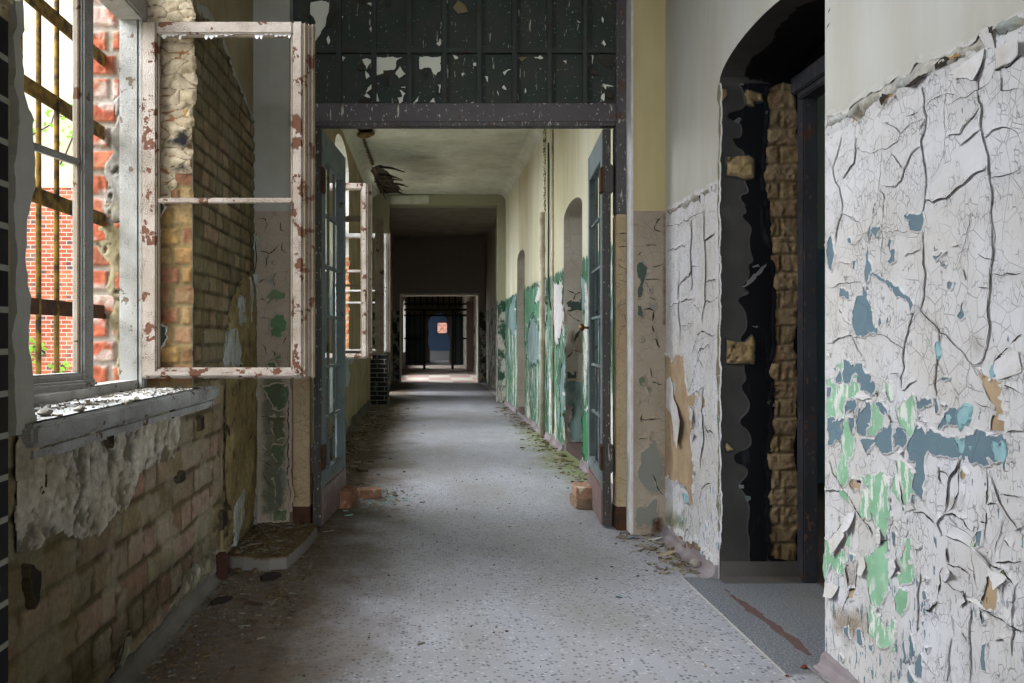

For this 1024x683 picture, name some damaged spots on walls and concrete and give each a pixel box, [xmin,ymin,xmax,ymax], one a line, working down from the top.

peeling [310,0,345,45]
peeling [357,21,545,103]
peeling [825,15,1023,136]
peeling [223,274,289,367]
peeling [508,273,588,462]
crack [618,211,718,535]
peeling [633,80,798,565]
peeling [824,203,916,339]
peeling [904,210,926,234]
crack [826,47,1024,397]
peeling [933,243,956,292]
peeling [823,350,1022,683]